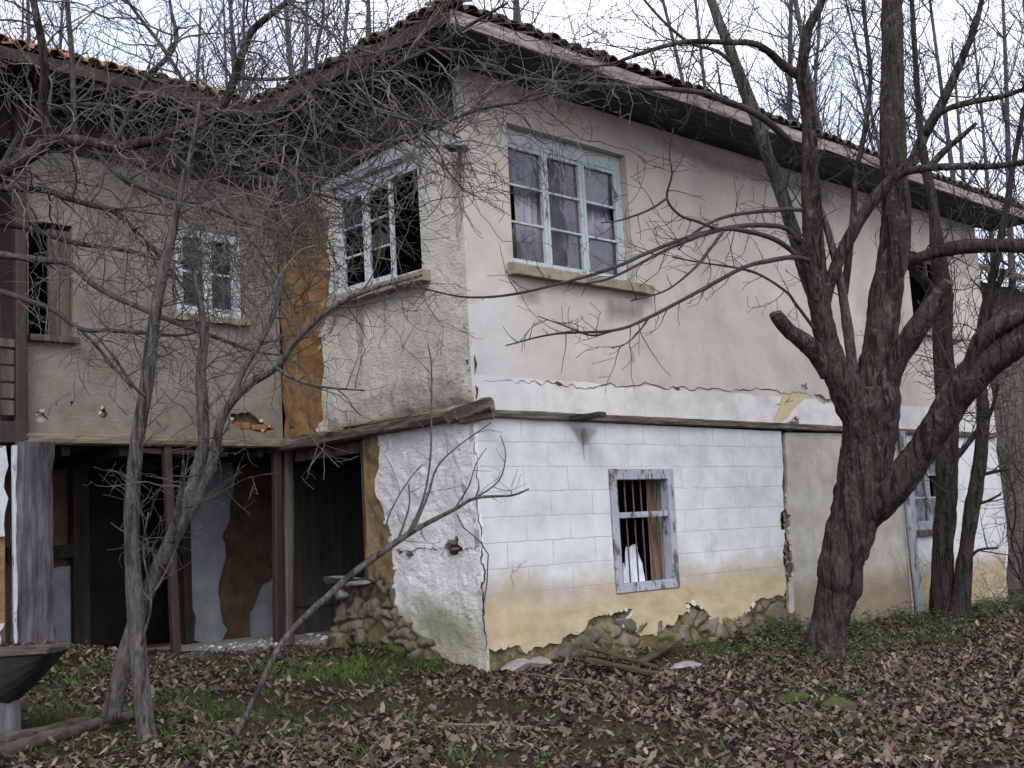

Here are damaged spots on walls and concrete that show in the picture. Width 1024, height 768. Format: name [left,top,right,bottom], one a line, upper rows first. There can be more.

flaking render [230,189,337,439]
flaking render [363,436,414,589]
flaking render [442,538,463,556]
crack [773,430,794,605]
spalling [440,575,802,673]
water stain [484,566,815,654]
water stain [851,569,931,624]